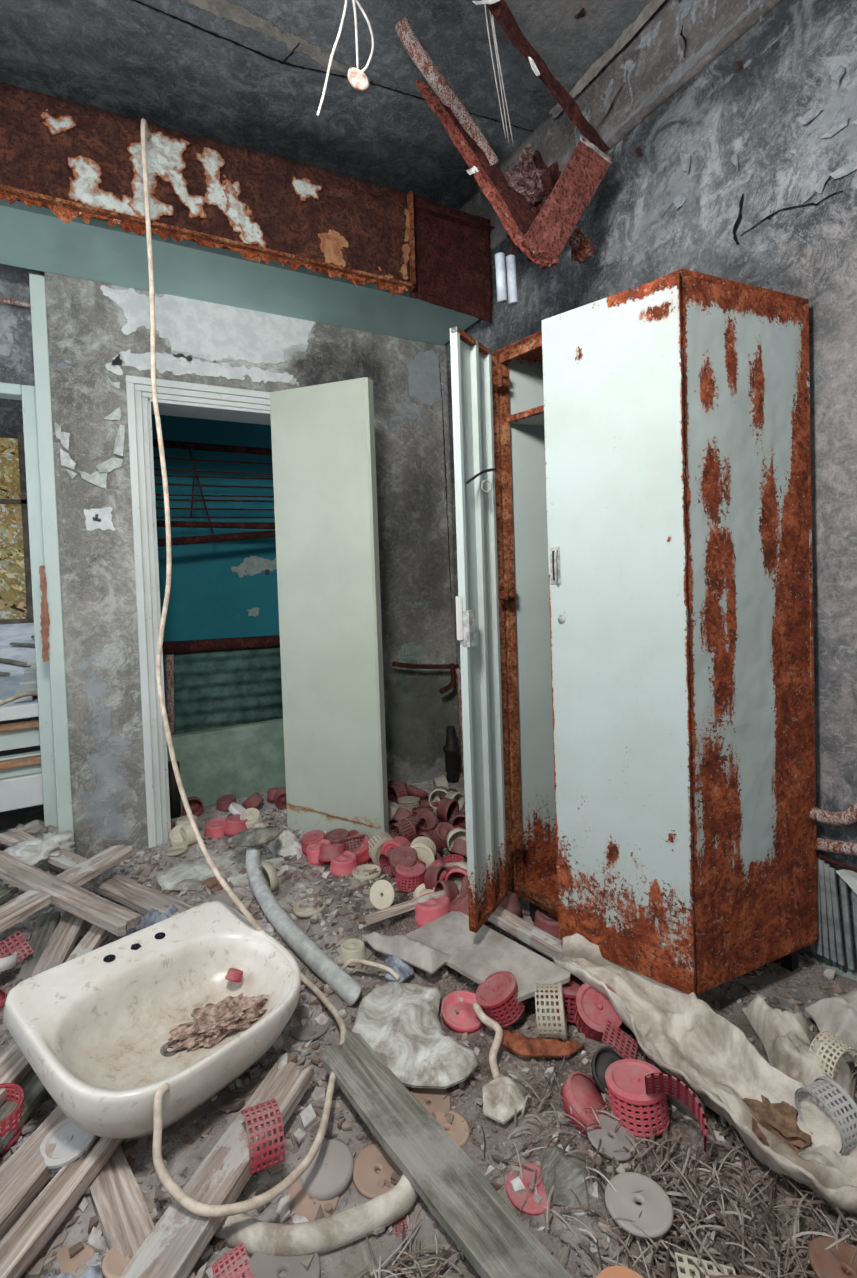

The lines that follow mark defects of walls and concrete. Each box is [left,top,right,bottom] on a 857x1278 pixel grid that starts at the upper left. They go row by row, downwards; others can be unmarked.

crack [469,0,686,132]
efflorescence [602,0,717,103]
rust [0,192,409,296]
crack [733,190,843,245]
peeling [100,285,316,389]
peeling [55,407,125,489]
peeling [84,507,116,531]
peeling [231,556,277,578]